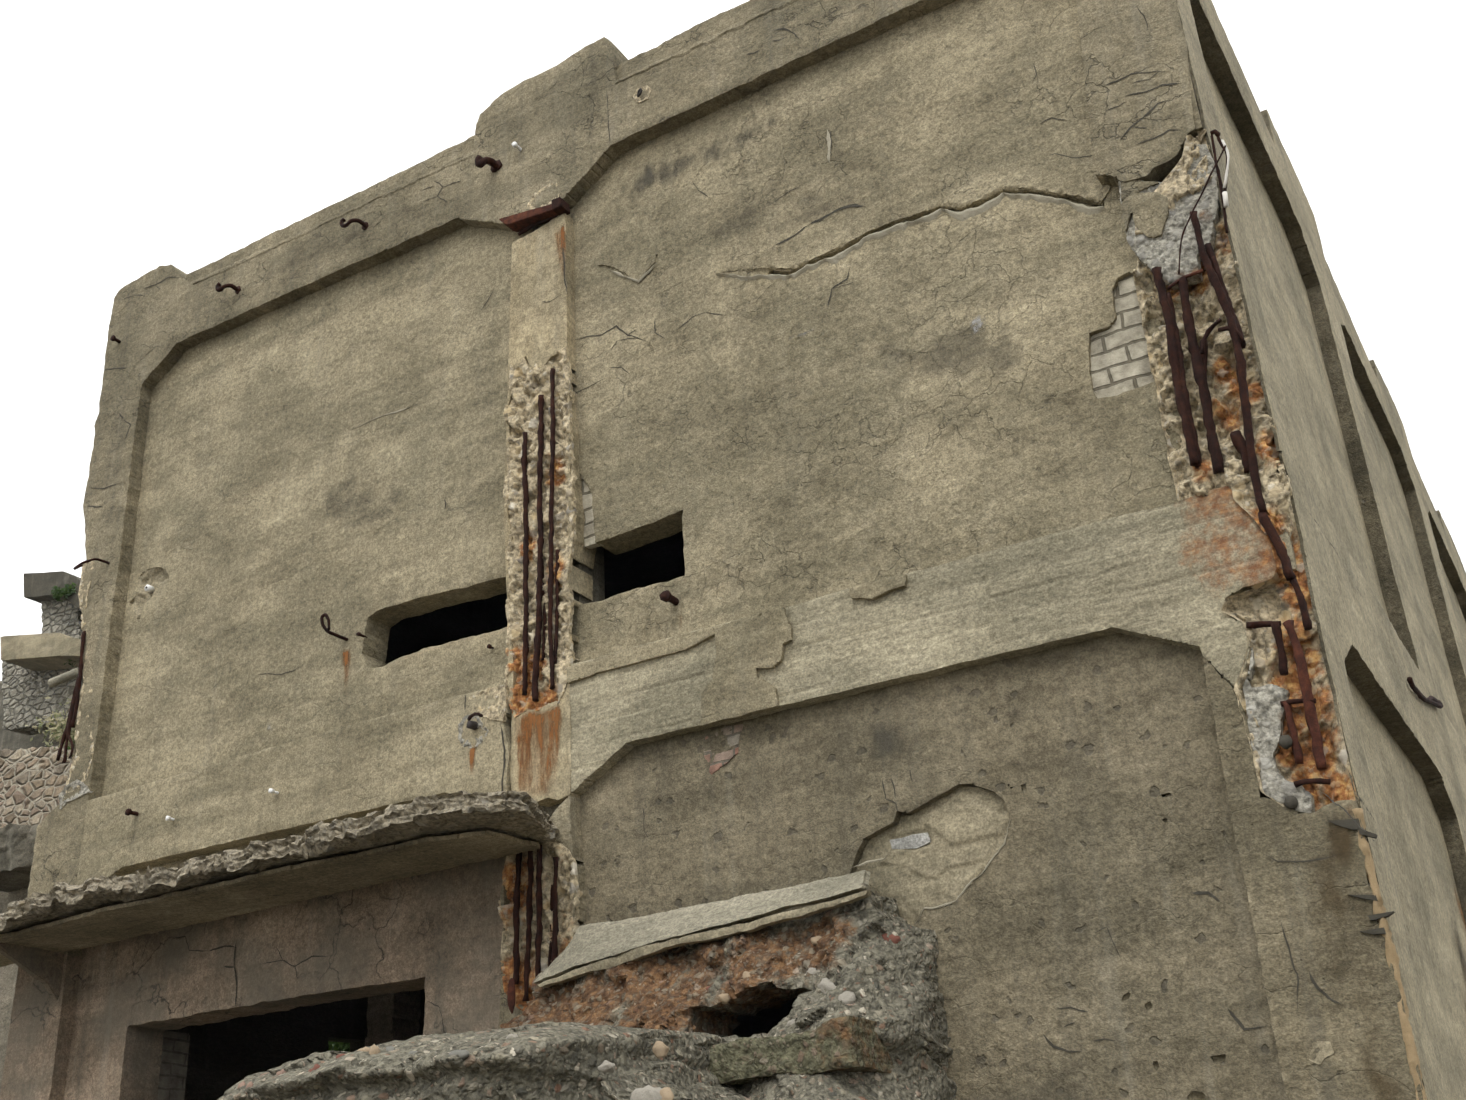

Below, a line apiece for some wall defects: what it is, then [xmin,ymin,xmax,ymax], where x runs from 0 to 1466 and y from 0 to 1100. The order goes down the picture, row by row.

crack [715,71,1179,305]
crack [575,312,722,393]
peeling [458,128,1427,1100]
corrosion [517,706,561,789]